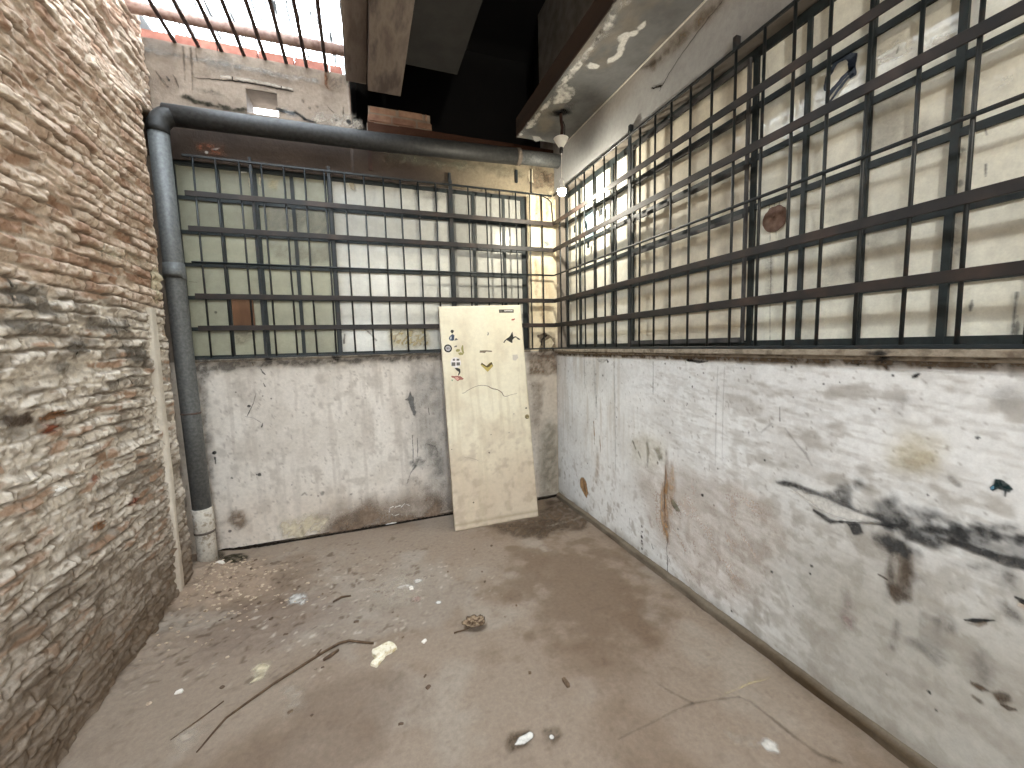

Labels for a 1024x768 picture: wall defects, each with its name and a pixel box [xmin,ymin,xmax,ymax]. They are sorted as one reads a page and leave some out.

flaking render [520,15,646,140]
rust [661,469,672,541]